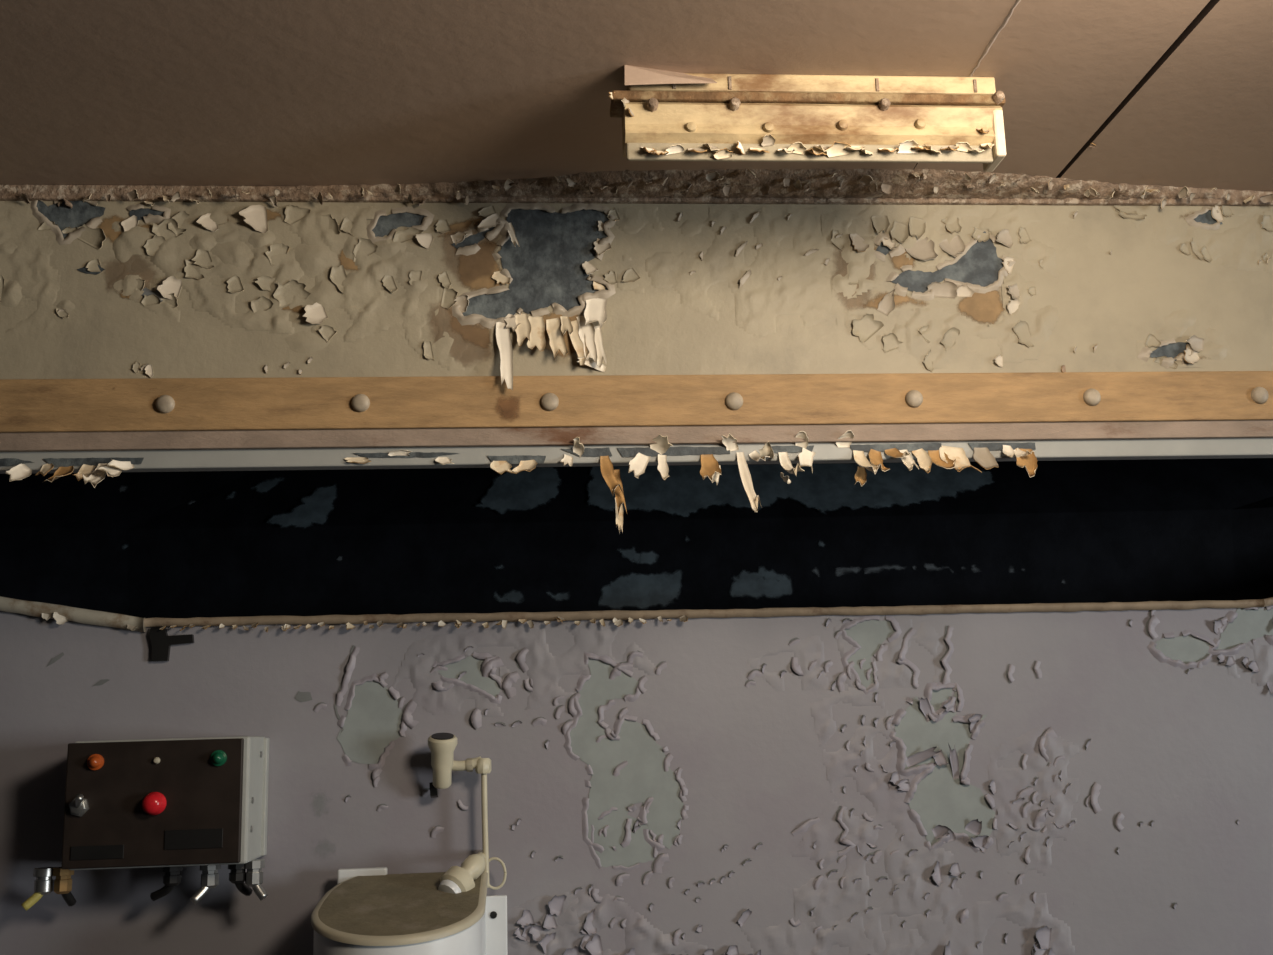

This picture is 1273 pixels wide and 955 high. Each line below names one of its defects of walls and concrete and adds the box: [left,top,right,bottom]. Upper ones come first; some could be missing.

peeling [30,200,640,390]
peeling [821,205,1059,372]
peeling [1136,309,1234,369]
peeling [1113,205,1273,275]
peeling [0,457,144,491]
peeling [476,430,1038,533]
peeling [730,567,792,598]
peeling [1128,605,1273,694]
peeling [160,548,763,904]
peeling [745,615,1154,955]